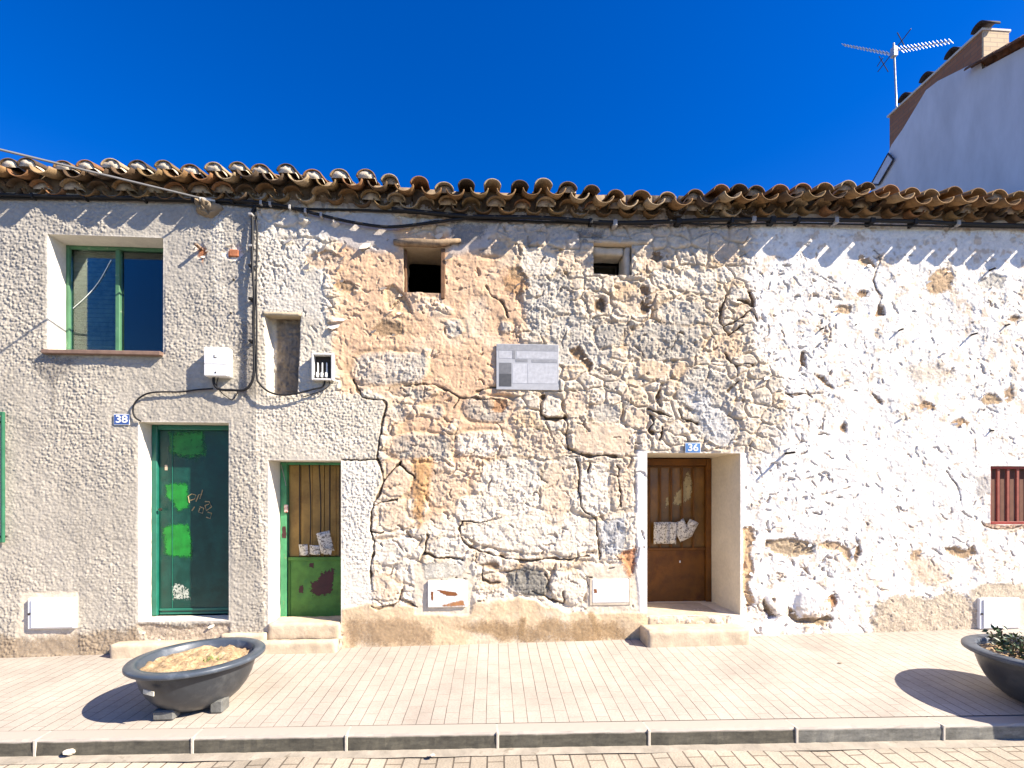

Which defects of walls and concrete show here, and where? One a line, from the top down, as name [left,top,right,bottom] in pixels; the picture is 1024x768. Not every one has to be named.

flaking render [509,267,529,286]
flaking render [370,285,412,337]
flaking render [570,346,593,372]
crack [718,292,758,393]
crack [406,383,500,408]
crack [341,379,415,578]
crack [424,395,622,604]
flaking render [742,523,862,626]
damp [346,619,433,645]
crack [373,589,417,610]
damp [466,612,626,643]
peeling [869,583,1024,632]